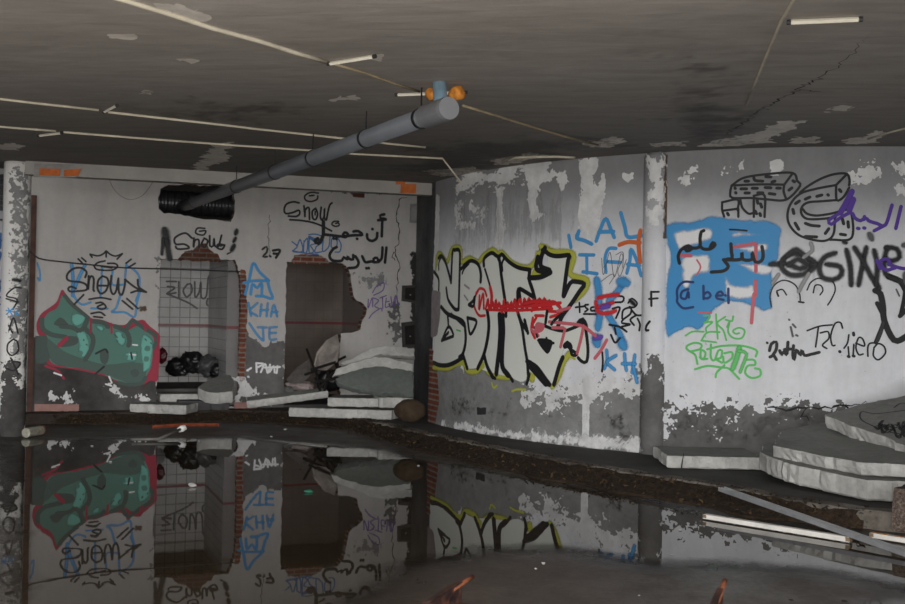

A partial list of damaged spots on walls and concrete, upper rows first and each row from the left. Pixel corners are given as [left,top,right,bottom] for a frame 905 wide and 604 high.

crack [725,35,868,136]
flaking render [396,181,416,193]
peeling [423,153,569,248]
peeling [578,137,627,241]
peeling [644,120,822,233]
peeling [841,130,886,144]
peeling [848,158,905,196]
peeling [0,161,157,437]
peeling [350,269,387,289]
peeling [431,194,440,337]
peeling [428,348,847,457]